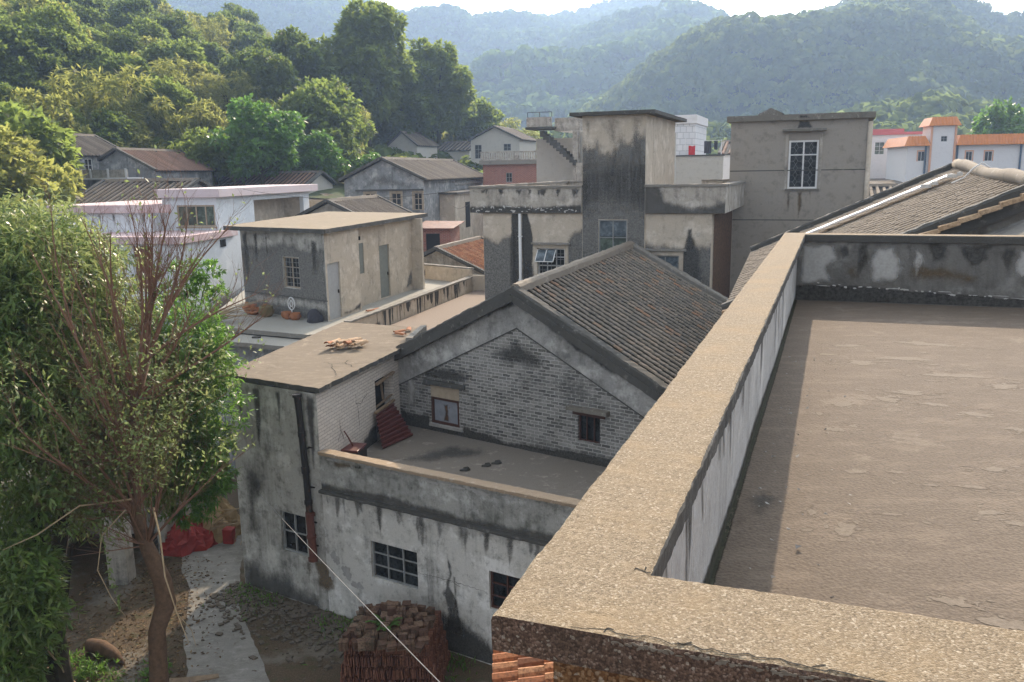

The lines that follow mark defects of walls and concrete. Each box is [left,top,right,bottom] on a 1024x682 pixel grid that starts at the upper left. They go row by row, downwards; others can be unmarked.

leakage [470,134,725,300]
leakage [211,234,328,321]
leakage [237,387,261,441]
leakage [499,343,540,365]
spalling [819,336,1024,435]
leakage [321,483,553,561]
leakage [245,563,319,607]
leakage [441,562,493,664]